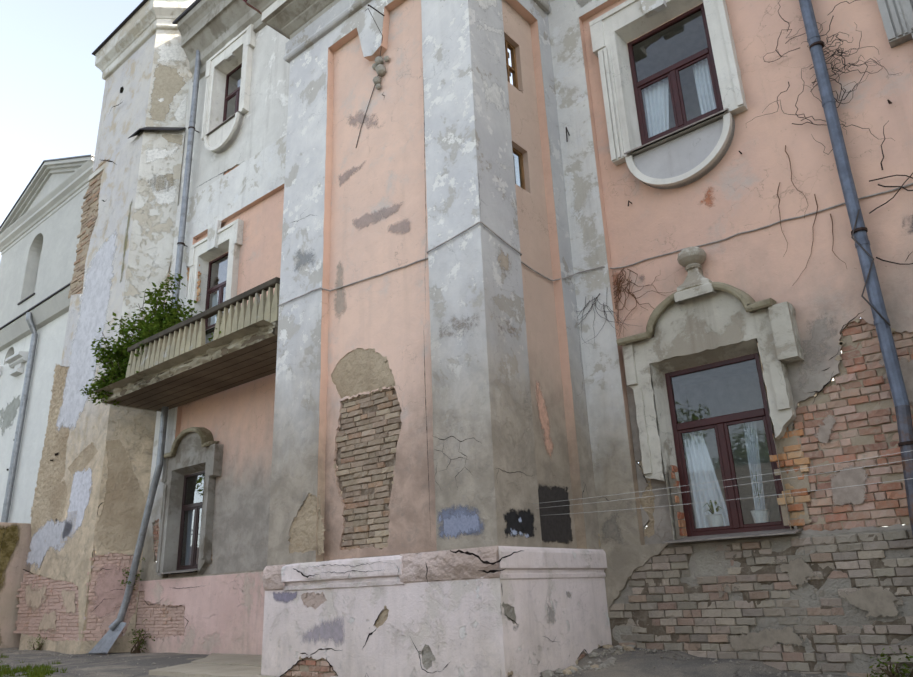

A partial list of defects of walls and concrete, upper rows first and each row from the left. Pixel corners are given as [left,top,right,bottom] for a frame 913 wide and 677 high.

flaking render [331,348,402,551]
crack [424,356,479,532]
flaking render [769,318,913,531]
spalling [13,363,185,642]
spalling [289,493,326,555]
crack [293,562,399,578]
spalling [374,606,389,628]
crack [450,550,520,625]
spalling [281,656,337,677]